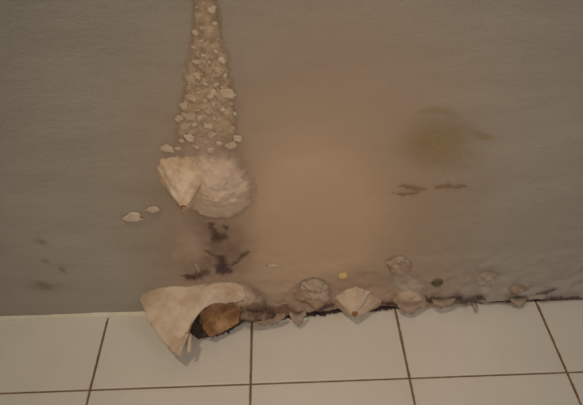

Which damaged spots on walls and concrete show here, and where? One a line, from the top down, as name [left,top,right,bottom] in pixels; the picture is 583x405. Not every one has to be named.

peeling [160,0,244,158]
peeling [122,206,160,223]
leakage [170,84,433,323]
flaking render [140,281,256,357]
leakage [449,296,528,304]